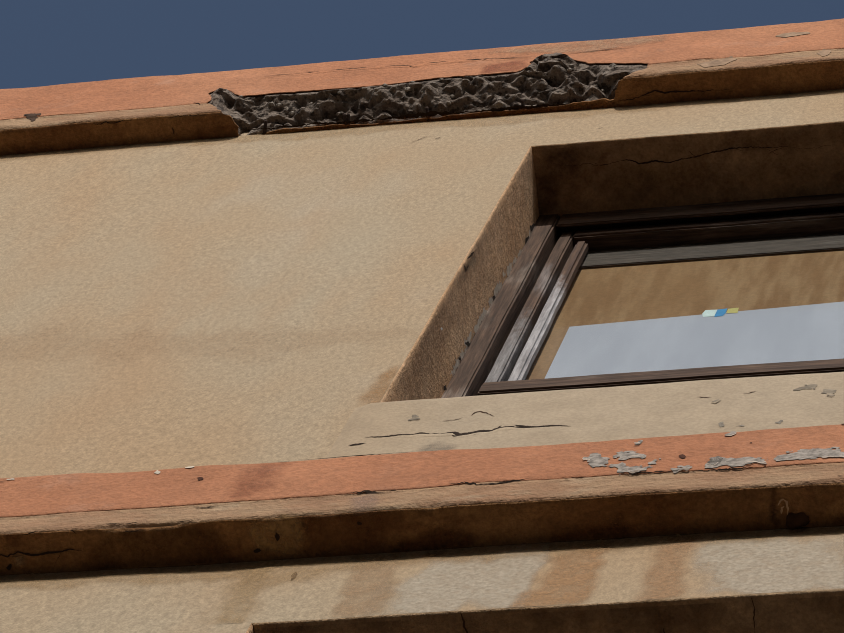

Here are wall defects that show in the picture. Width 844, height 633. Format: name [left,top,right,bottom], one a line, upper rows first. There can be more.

spalling [172,52,648,136]
crack [560,145,831,166]
peeling [793,384,837,396]
crack [351,411,567,445]
peeling [582,440,661,475]
peeling [671,454,692,473]
crack [621,465,760,475]
peeling [705,447,844,468]
crack [351,487,402,495]
crack [450,478,524,486]
water stain [394,529,548,613]
water stain [698,531,844,593]